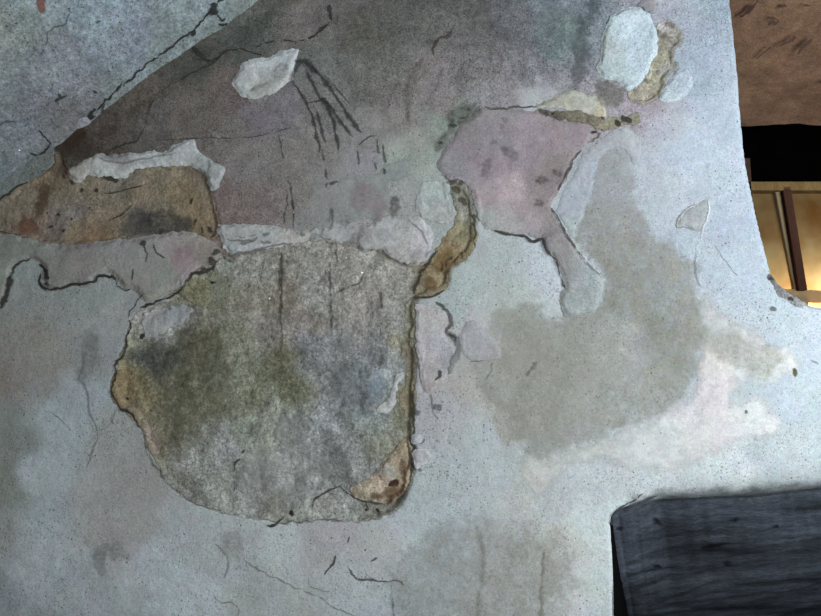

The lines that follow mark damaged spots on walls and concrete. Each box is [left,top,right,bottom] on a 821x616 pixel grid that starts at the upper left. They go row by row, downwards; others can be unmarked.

crack [0,94,67,156]
crack [87,0,332,150]
peeling [637,0,663,14]
spalling [0,20,683,525]
water stain [476,128,797,495]
crack [217,536,404,616]